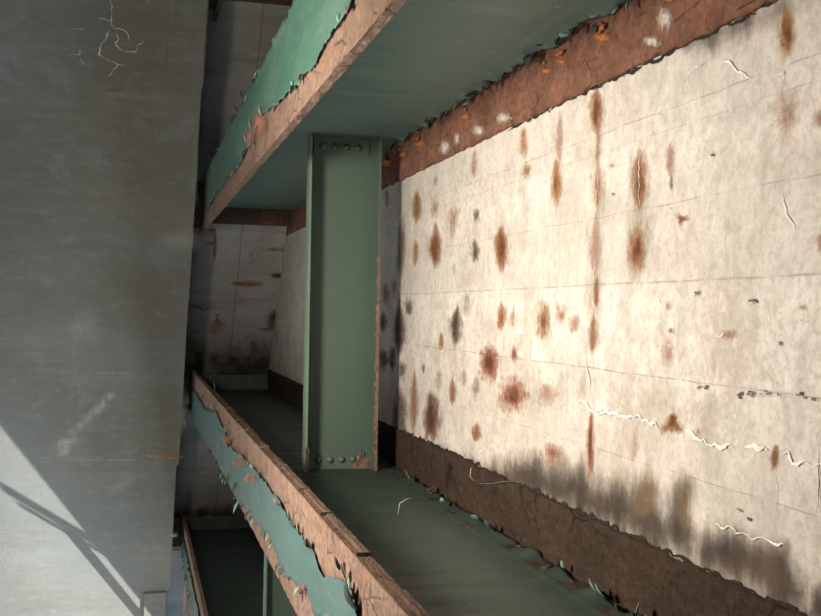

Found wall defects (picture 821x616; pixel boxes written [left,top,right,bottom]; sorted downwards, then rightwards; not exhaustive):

crack [79,0,142,76]
peeling [206,0,351,212]
peeling [382,0,632,150]
crack [507,2,775,131]
rust [495,228,508,271]
rust [411,375,439,441]
rust [479,348,498,380]
peeling [190,389,358,616]
damp [491,457,691,553]
crack [402,428,821,616]
damp [700,533,800,603]
damp [813,593,821,616]